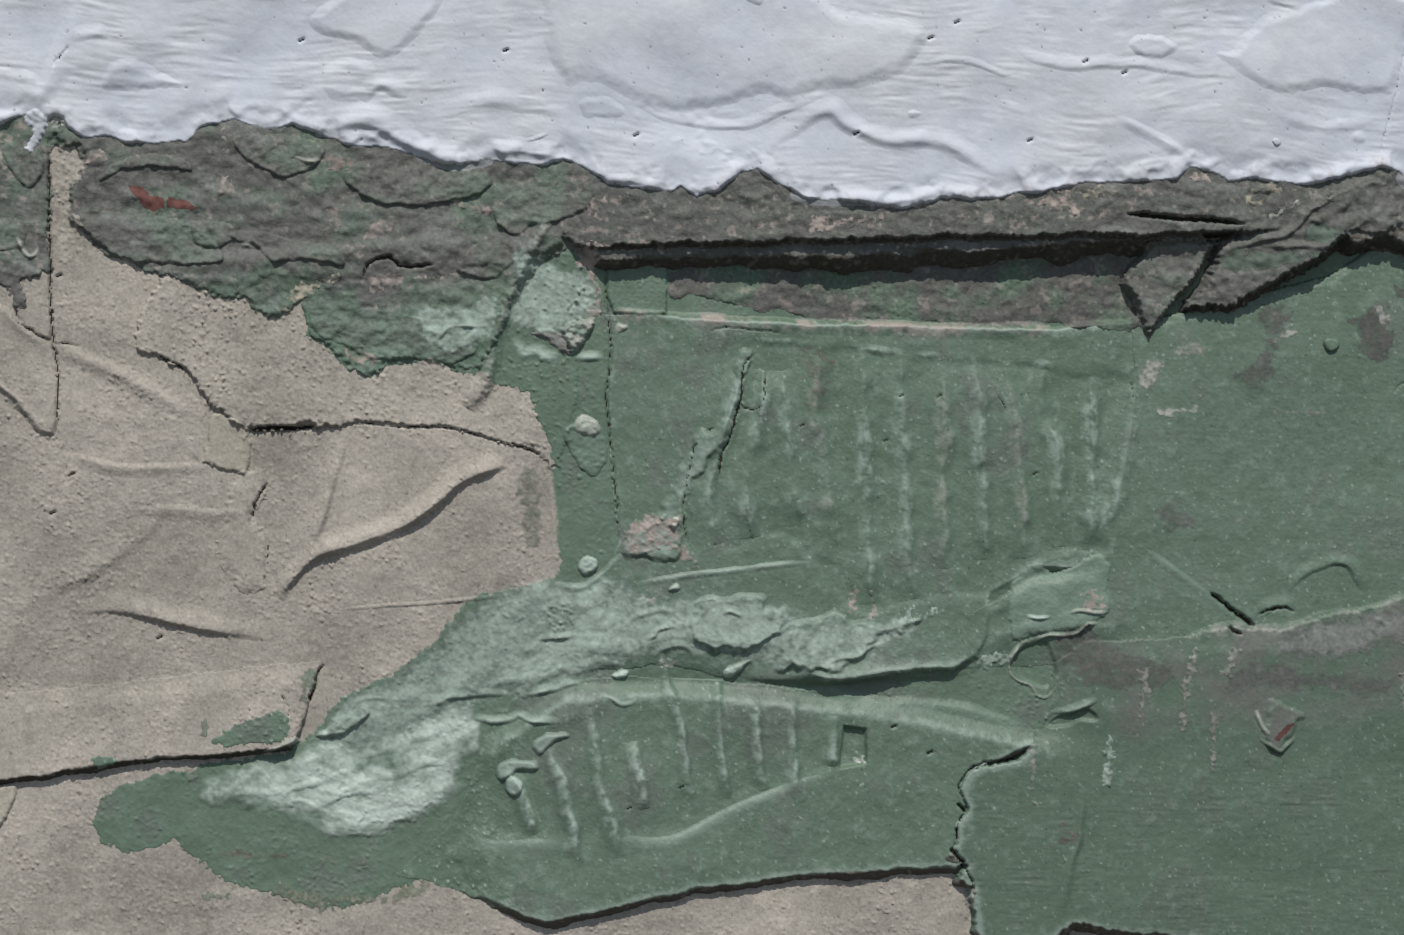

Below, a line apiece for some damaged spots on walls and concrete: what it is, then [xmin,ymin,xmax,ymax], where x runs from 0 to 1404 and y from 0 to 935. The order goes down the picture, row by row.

peeling [809,211,889,233]
peeling [1039,183,1118,217]
peeling [1119,170,1404,338]
crack [16,159,69,420]
peeling [0,116,606,595]
crack [252,424,313,432]
crack [368,423,537,454]
peeling [0,782,19,827]
spalling [963,881,978,925]